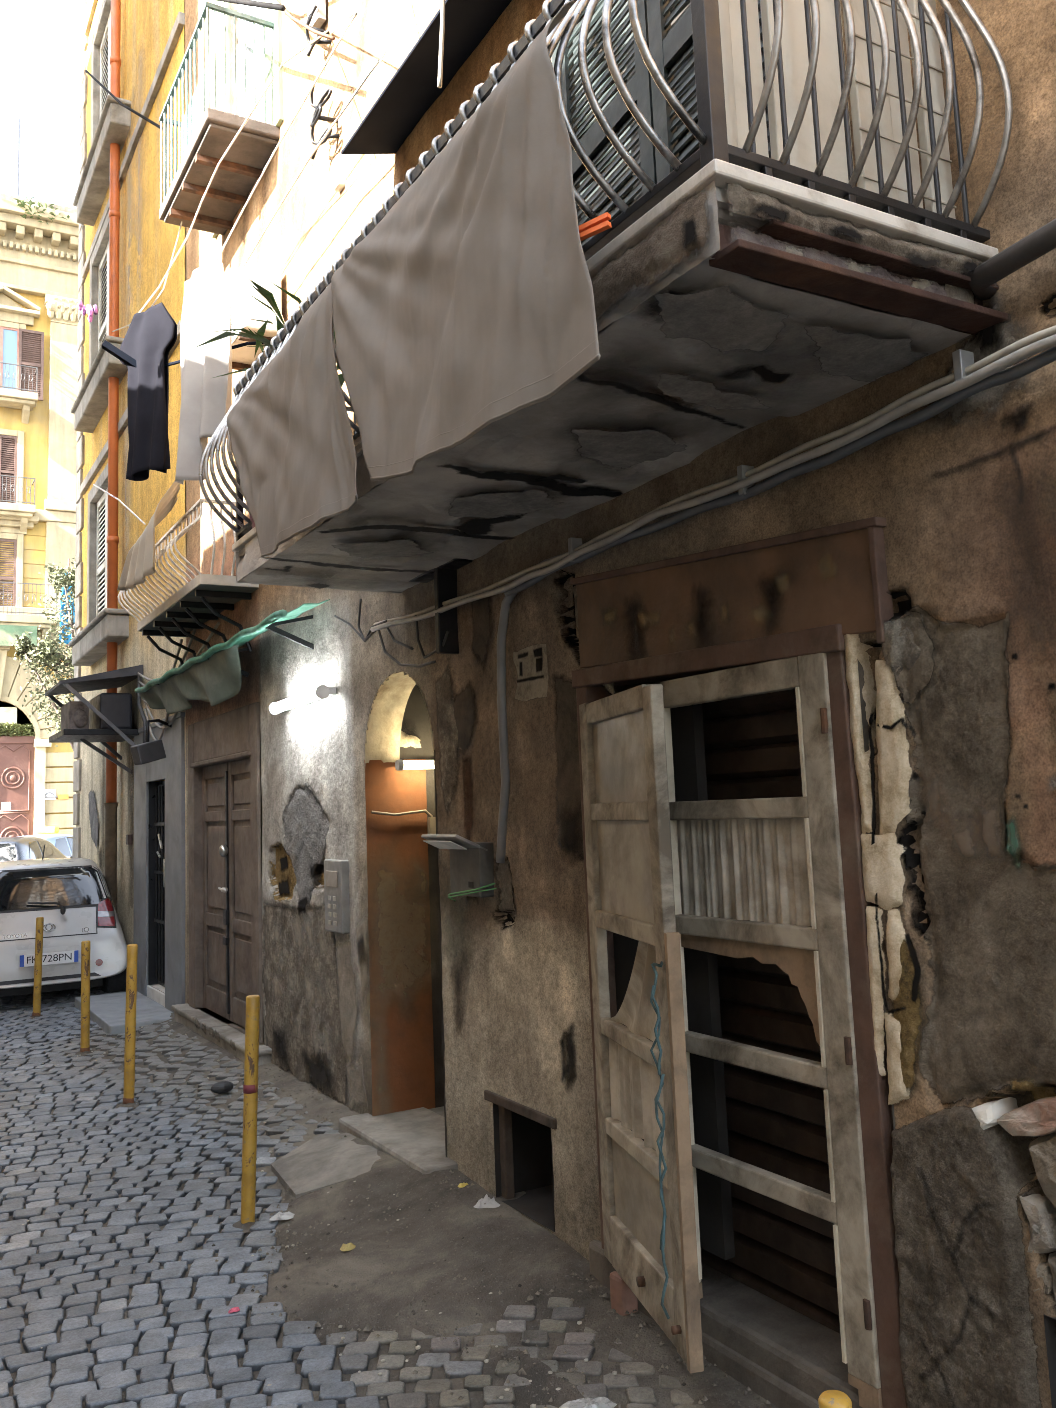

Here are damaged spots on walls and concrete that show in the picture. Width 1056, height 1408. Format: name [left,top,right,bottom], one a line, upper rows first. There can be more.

peeling [592,191,928,410]
spalling [726,183,1031,432]
spalling [1040,293,1056,316]
peeling [332,539,433,558]
peeling [449,490,562,518]
peeling [571,429,687,469]
peeling [262,782,369,1110]
spalling [844,590,1056,1312]